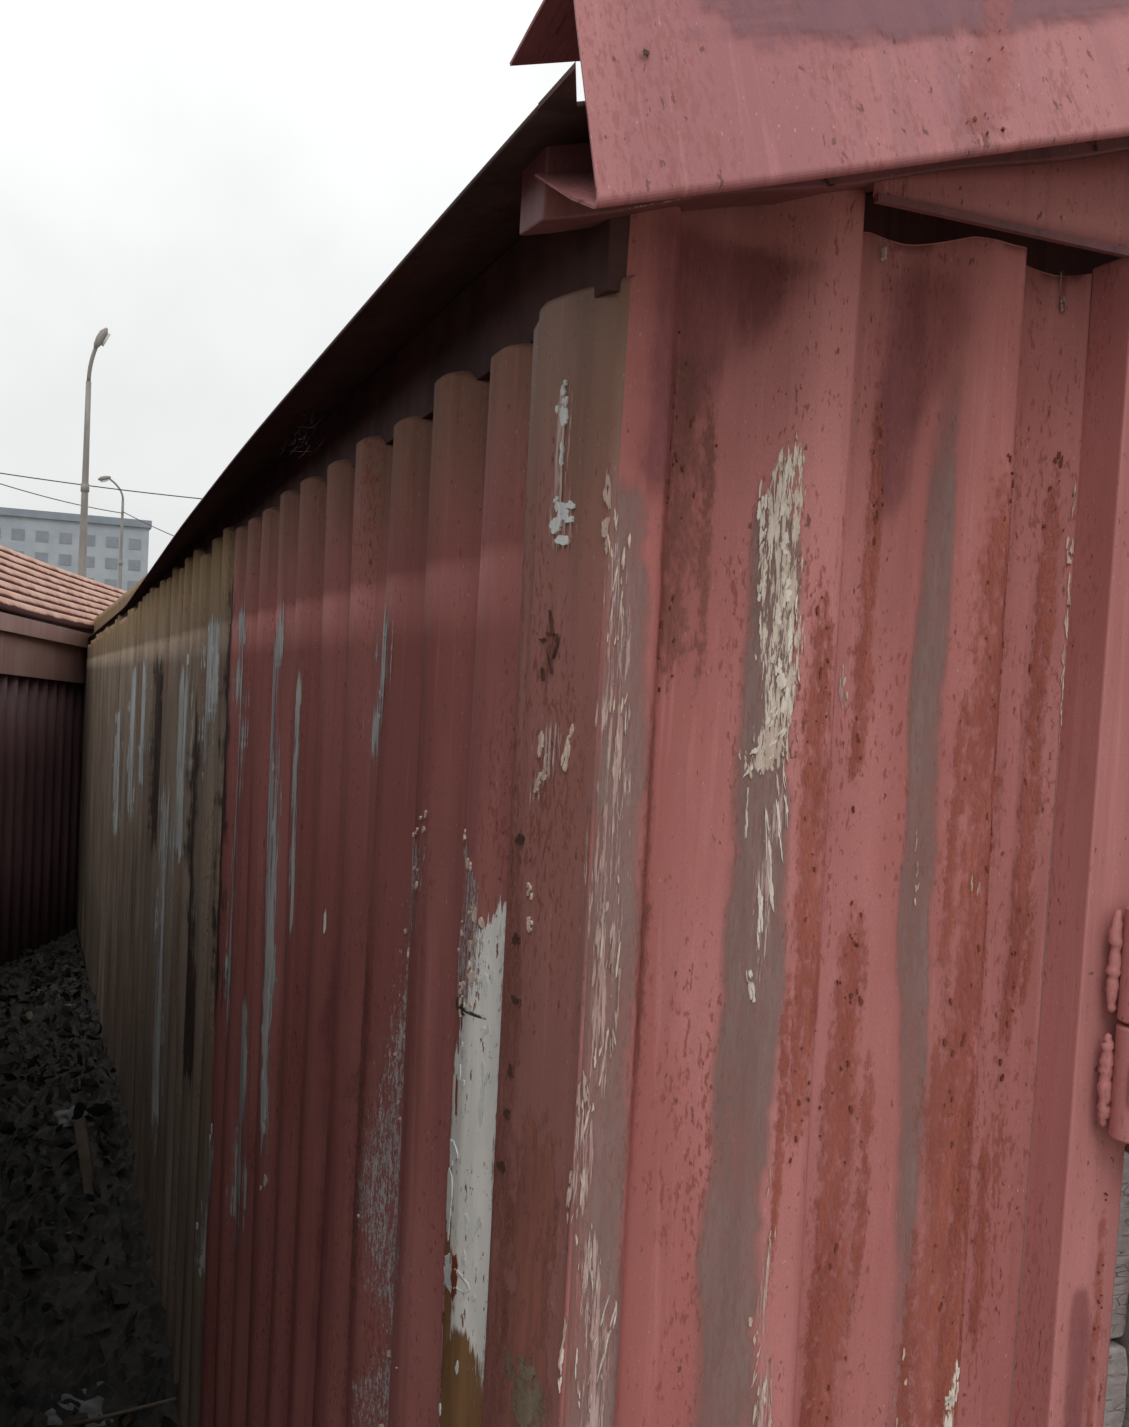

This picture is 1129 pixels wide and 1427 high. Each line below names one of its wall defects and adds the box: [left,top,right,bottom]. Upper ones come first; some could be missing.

peeling [441,829,507,1406]
corrosion [439,802,525,1427]
peeling [530,724,574,803]
peeling [549,380,575,549]
peeling [558,1317,568,1369]
peeling [566,469,631,1289]
corrosion [633,351,718,1131]
peeling [739,433,809,839]
corrosion [768,580,875,1427]
corrosion [849,401,886,783]
peeling [943,1359,960,1427]
corrosion [895,452,1065,1427]